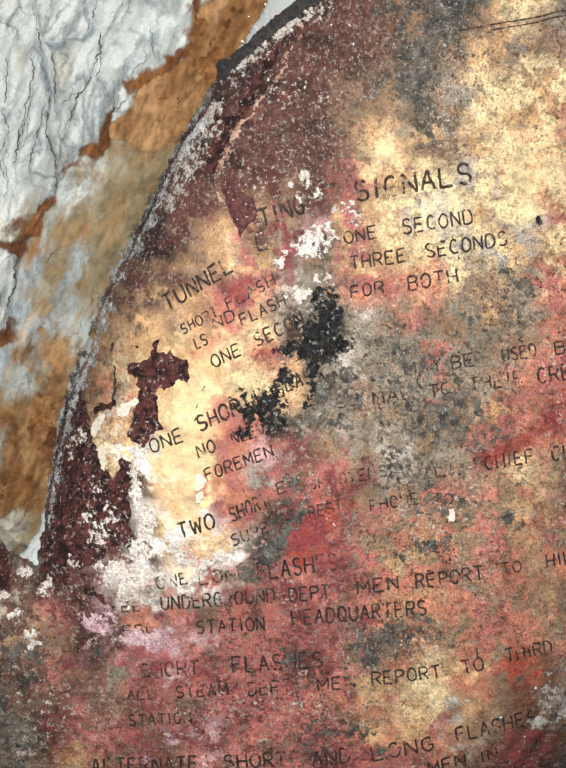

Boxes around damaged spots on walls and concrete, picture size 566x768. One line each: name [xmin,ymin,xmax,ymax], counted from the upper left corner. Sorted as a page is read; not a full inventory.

damp [368,0,480,112]
crack [0,0,155,322]
rust [62,0,267,290]
rust [0,196,56,257]
rust [42,204,87,281]
damp [490,255,536,344]
peeling [0,548,11,593]
rust [0,299,77,518]
peeling [40,340,190,609]
damp [228,285,512,557]
damp [500,508,526,531]